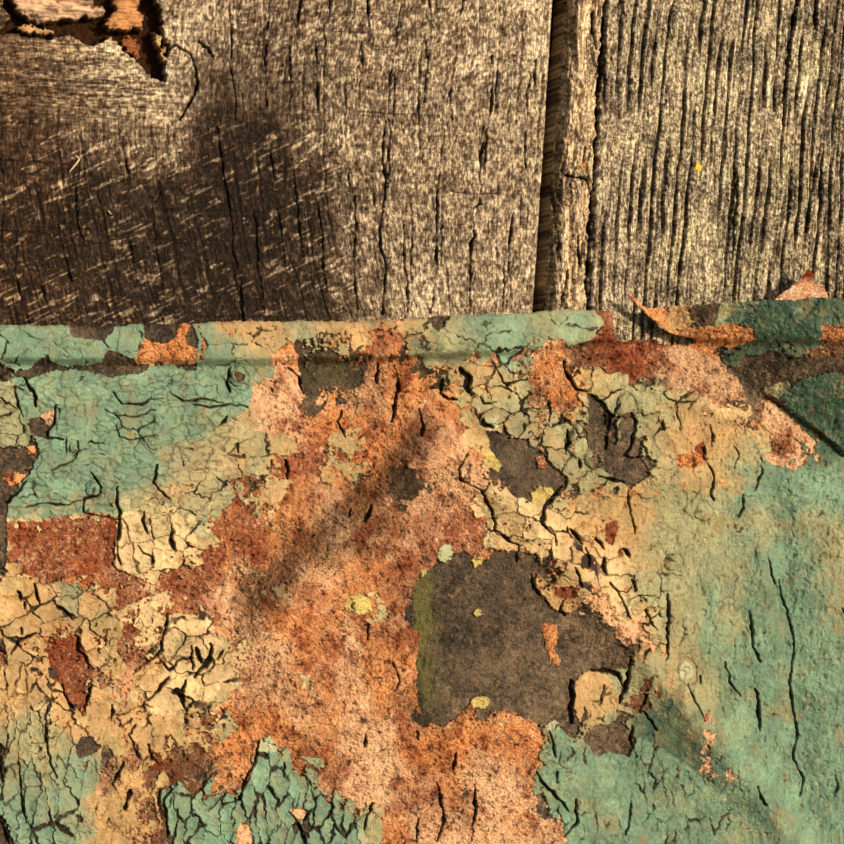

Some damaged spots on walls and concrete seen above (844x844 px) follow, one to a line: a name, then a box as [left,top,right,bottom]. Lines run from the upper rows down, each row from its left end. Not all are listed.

crack [0,583,94,779]
crack [5,367,249,569]
crack [140,613,224,710]
peeling [0,309,710,844]
rust [288,356,441,468]
rust [218,462,565,844]
crack [439,359,527,430]
crack [539,400,672,661]
rust [532,322,756,408]
rust [676,442,707,468]
crack [768,560,805,797]
rust [759,401,821,456]